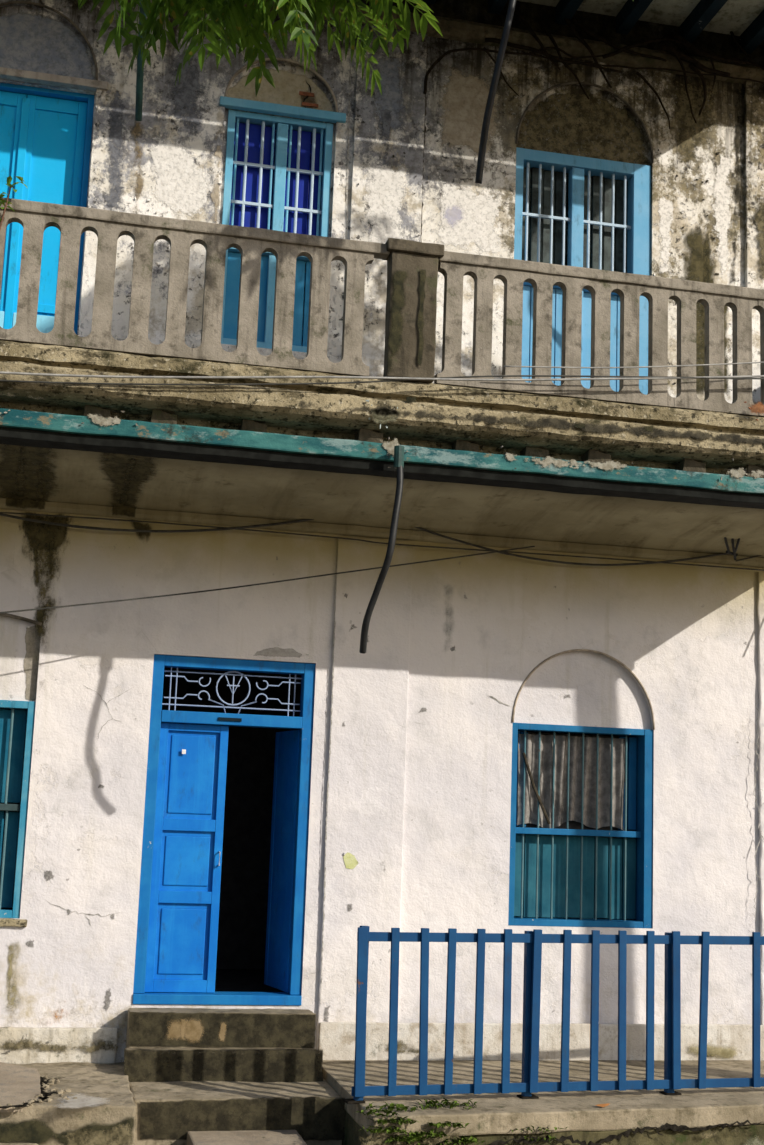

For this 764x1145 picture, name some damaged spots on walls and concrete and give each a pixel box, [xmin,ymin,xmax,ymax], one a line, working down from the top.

damp [0,0,94,85]
damp [96,91,159,214]
damp [516,92,661,165]
damp [672,79,720,177]
damp [734,89,744,214]
damp [682,226,715,283]
damp [696,302,705,394]
peeling [81,411,125,427]
spalling [366,397,416,468]
damp [343,405,764,444]
damp [100,453,155,539]
damp [0,444,69,643]